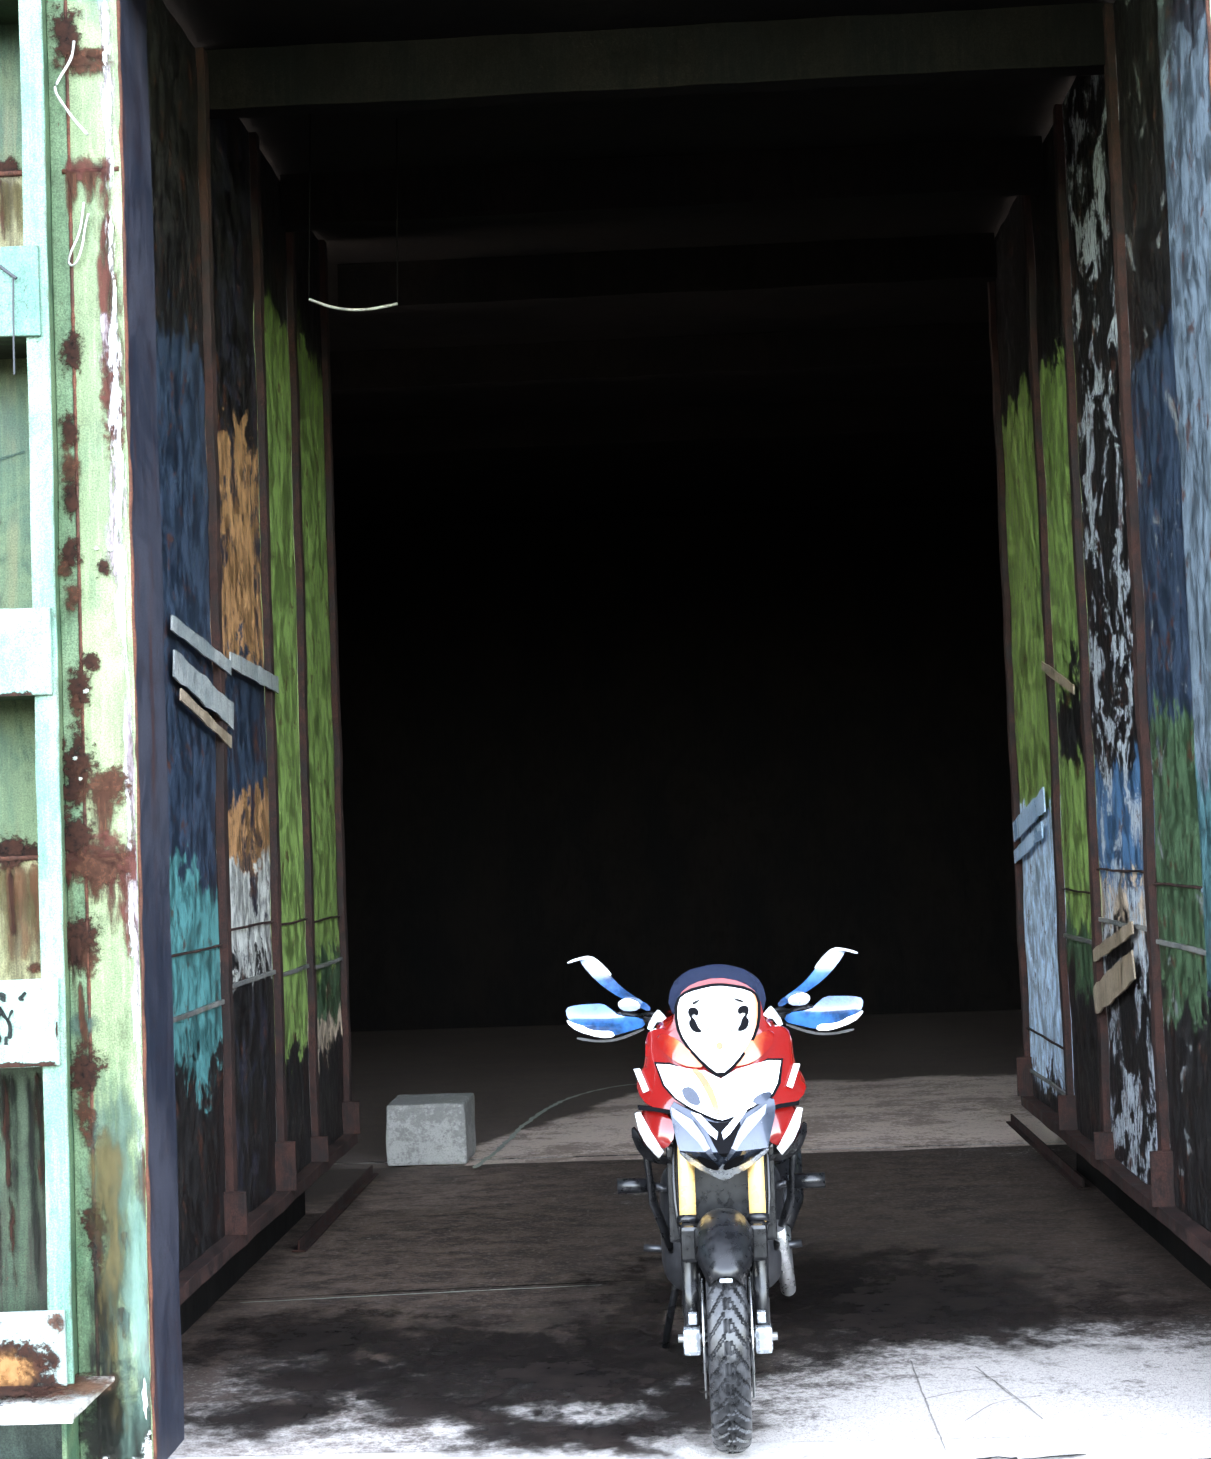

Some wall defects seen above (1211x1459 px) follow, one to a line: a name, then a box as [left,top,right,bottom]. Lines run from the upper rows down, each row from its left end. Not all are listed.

corrosion [47,2,113,77]
corrosion [0,155,22,239]
corrosion [65,155,111,221]
corrosion [59,318,85,378]
corrosion [57,409,113,616]
corrosion [0,652,140,1154]
corrosion [77,1148,152,1442]
corrosion [0,1313,118,1406]